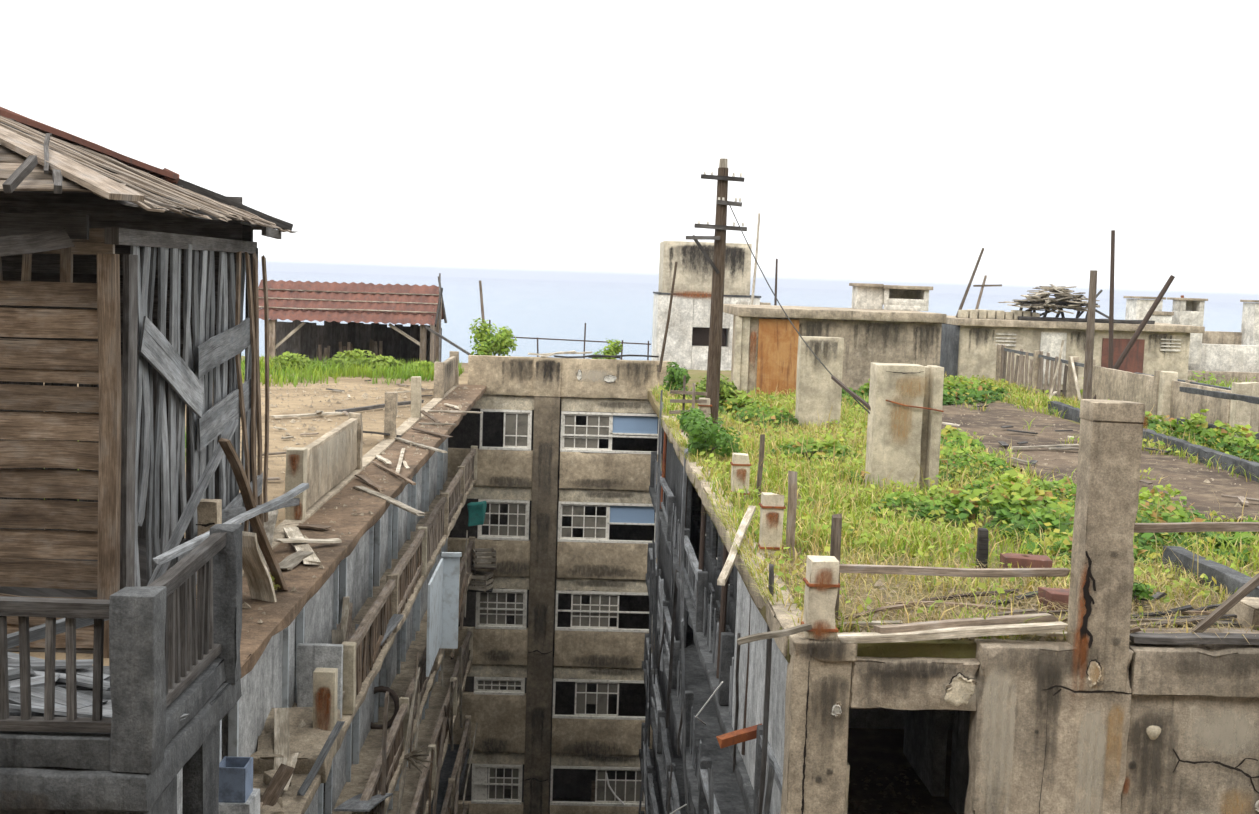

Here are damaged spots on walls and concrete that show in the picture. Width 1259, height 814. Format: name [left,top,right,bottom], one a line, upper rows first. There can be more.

corrosion [289,454,299,470]
corrosion [816,570,832,590]
corrosion [1073,570,1089,678]
corrosion [316,687,331,729]
spalling [944,672,977,707]
crack [1039,551,1132,814]
spalling [1086,659,1103,687]
crack [1172,749,1259,793]